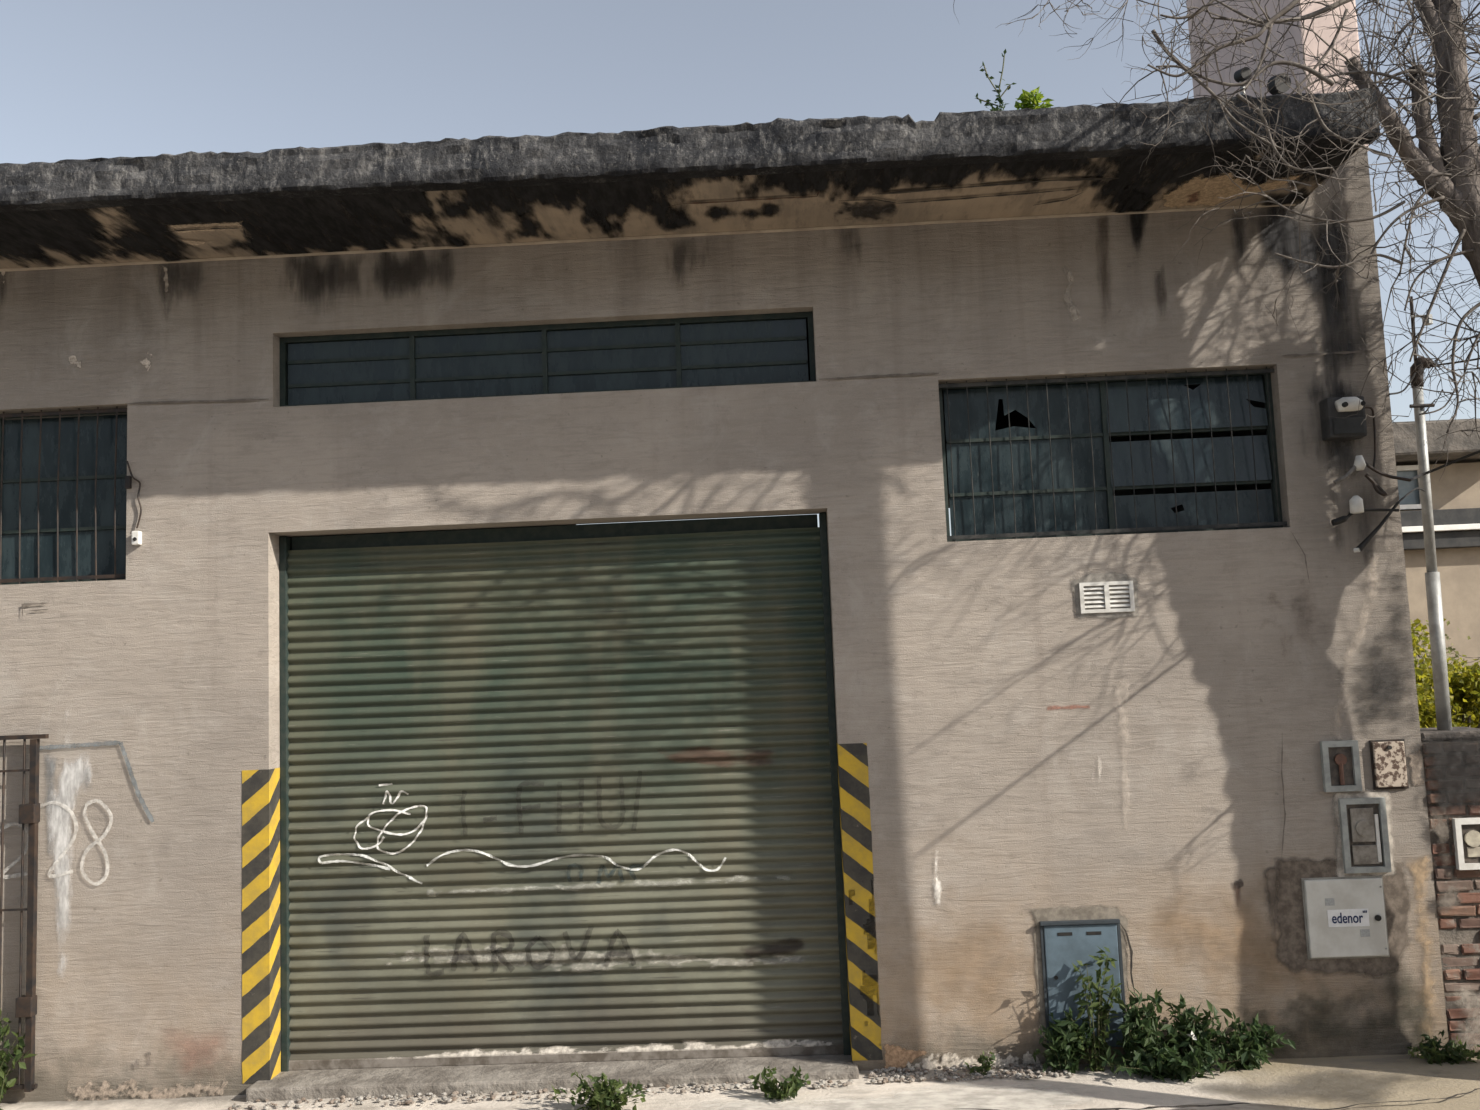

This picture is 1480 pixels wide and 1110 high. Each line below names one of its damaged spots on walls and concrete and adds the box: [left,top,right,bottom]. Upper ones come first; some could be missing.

leakage [0,145,1360,367]
leakage [1327,440,1354,470]
leakage [1355,605,1414,723]
rust [669,748,771,766]
crack [1269,743,1286,850]